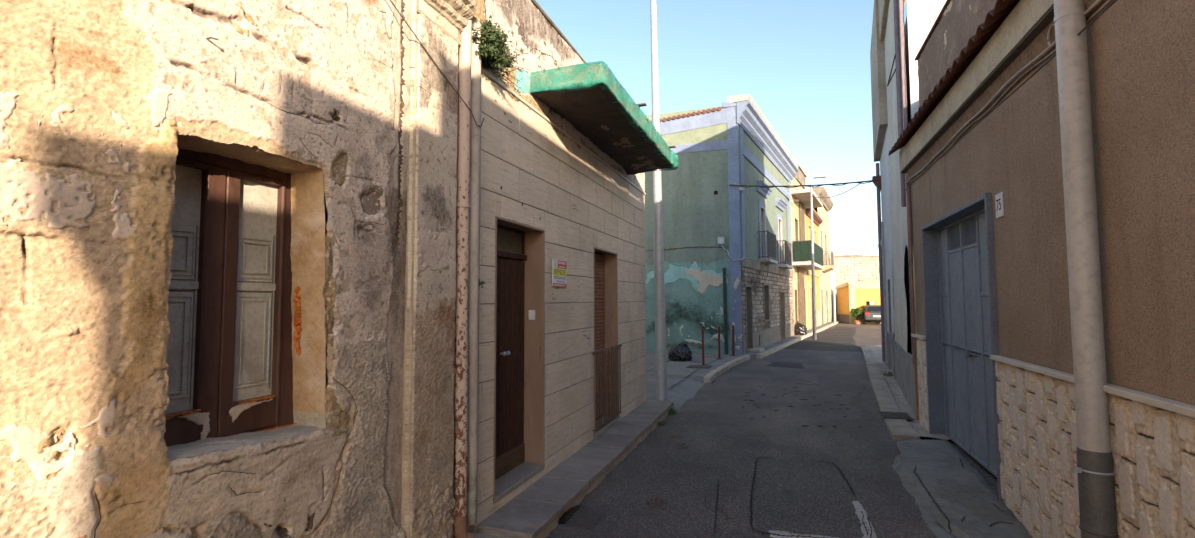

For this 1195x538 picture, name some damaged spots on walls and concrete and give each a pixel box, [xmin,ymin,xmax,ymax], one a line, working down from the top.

peeling [0,92,96,229]
peeling [110,188,135,240]
peeling [0,399,116,480]
peeling [165,412,210,440]
peeling [229,398,273,422]
spalling [264,523,292,538]